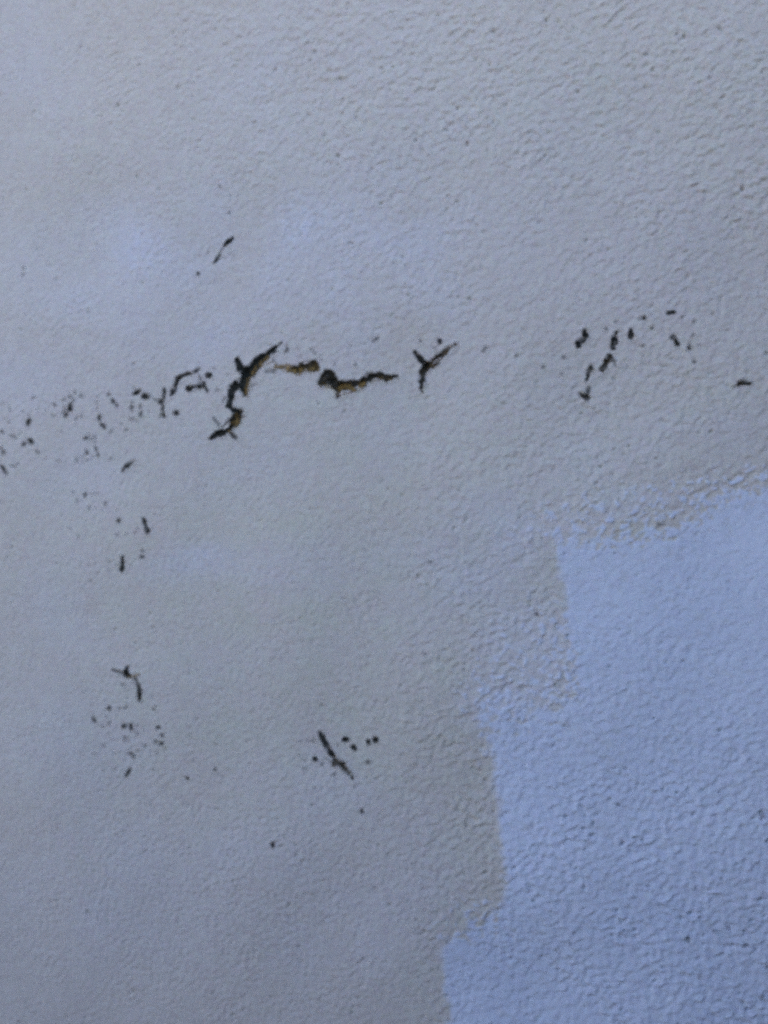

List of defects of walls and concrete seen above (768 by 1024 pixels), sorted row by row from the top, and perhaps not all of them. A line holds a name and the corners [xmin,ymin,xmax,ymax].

crack [214,237,234,263]
crack [170,372,192,396]
crack [209,342,457,440]
crack [575,328,634,400]
crack [112,666,142,701]
crack [319,731,353,779]